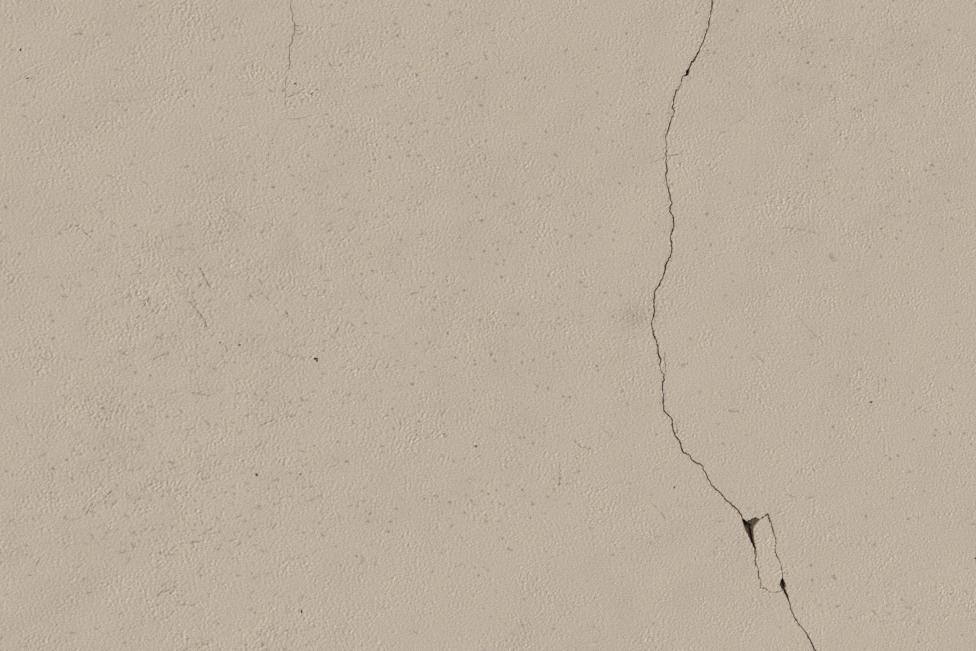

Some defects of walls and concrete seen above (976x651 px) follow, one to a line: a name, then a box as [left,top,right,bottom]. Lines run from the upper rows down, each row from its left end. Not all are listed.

crack [651,0,816,651]